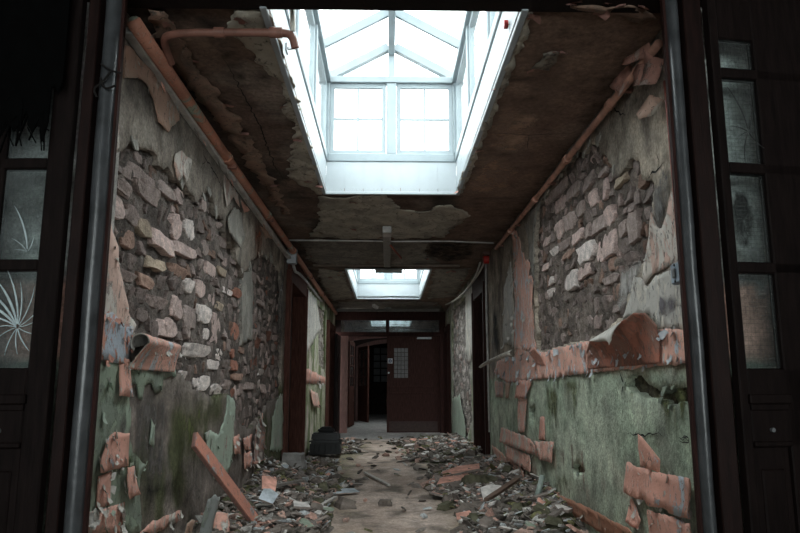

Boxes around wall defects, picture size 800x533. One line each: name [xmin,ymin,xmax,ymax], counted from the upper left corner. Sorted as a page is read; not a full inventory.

peeling [123,45,180,132]
peeling [148,9,290,215]
peeling [609,43,664,97]
peeling [636,95,665,119]
spalling [88,126,284,533]
peeling [227,9,472,437]
spalling [492,132,688,478]
peeling [554,434,692,533]